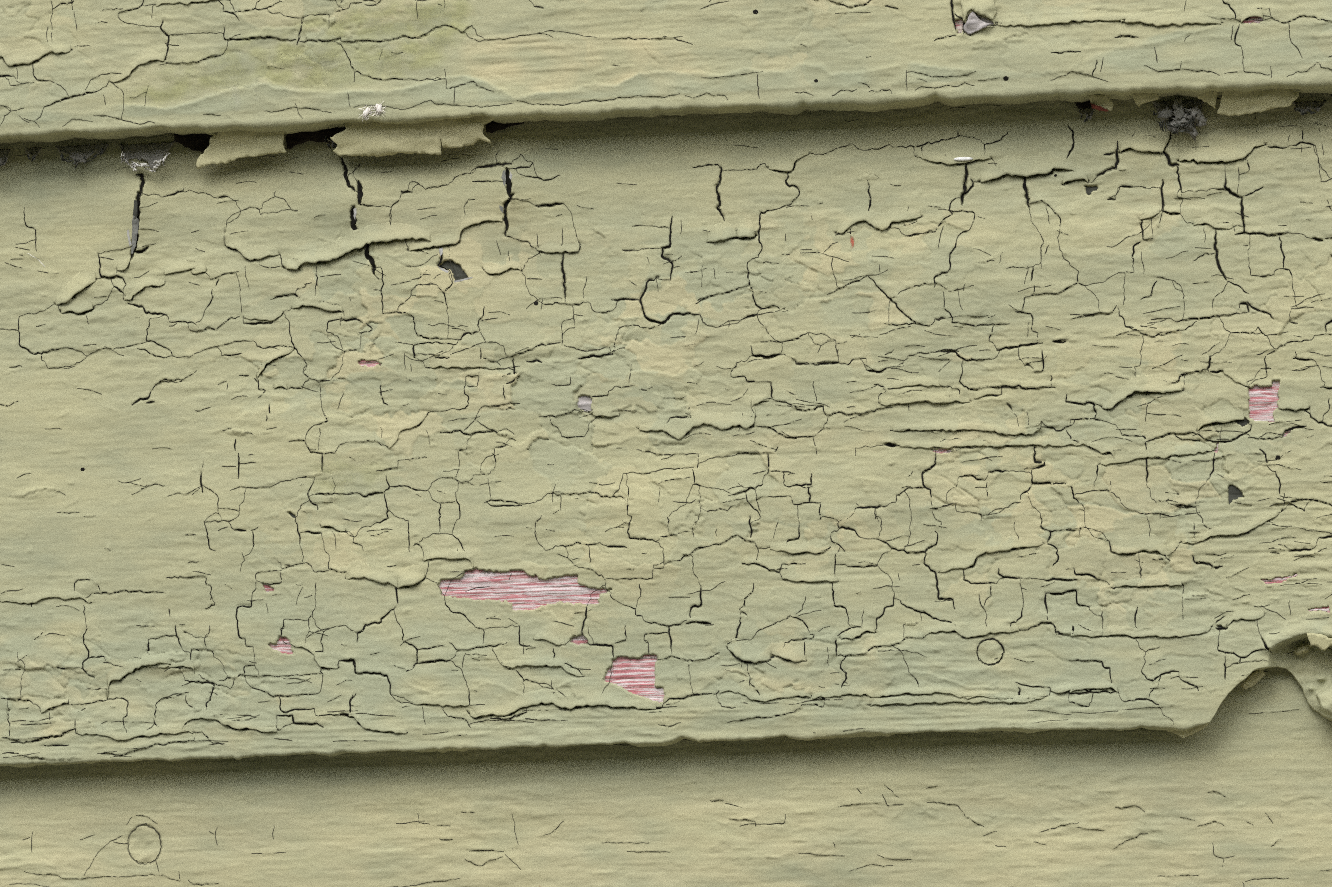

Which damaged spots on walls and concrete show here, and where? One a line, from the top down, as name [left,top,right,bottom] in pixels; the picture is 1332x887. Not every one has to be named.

crack [817,0,898,14]
crack [0,0,763,156]
crack [934,0,1332,99]
peeling [174,115,525,169]
crack [0,70,1332,760]
spalling [1232,380,1290,437]
spalling [439,569,612,610]
spalling [269,637,293,654]
spalling [605,655,665,703]
crack [393,812,563,887]
crack [840,786,1148,849]
crack [1159,791,1288,885]